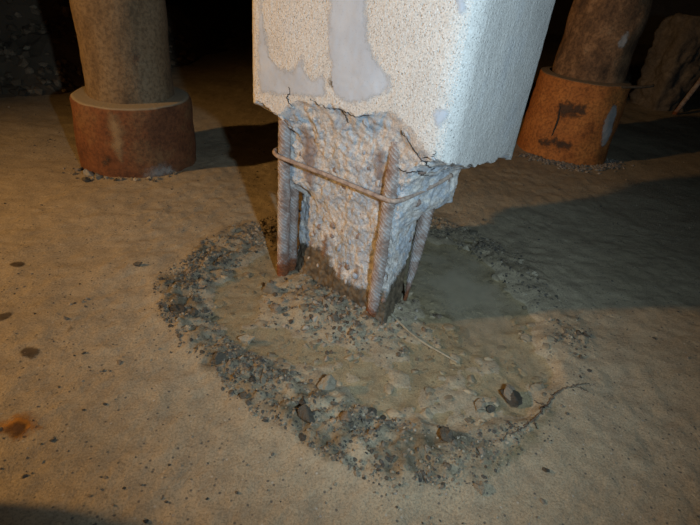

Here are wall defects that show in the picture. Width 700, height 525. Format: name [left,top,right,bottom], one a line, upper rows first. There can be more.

crack [310,99,370,123]
damp [559,103,586,117]
peeling [601,106,617,146]
rust [303,131,315,184]
spalling [254,0,490,303]
crack [397,130,436,176]
rust [1,415,33,438]
crack [503,383,590,440]